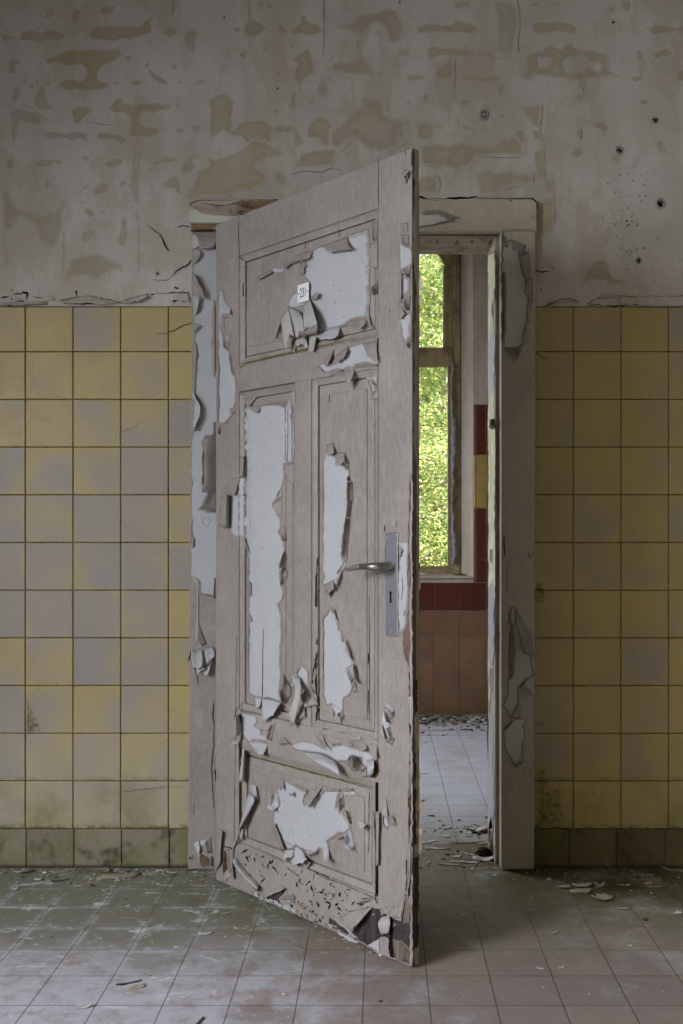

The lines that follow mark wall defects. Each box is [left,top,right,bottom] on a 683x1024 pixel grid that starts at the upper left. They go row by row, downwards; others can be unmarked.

flaking render [0,290,154,306]
crack [150,199,278,297]
peeling [398,210,461,348]
peeling [170,209,450,941]
peeling [460,232,683,863]